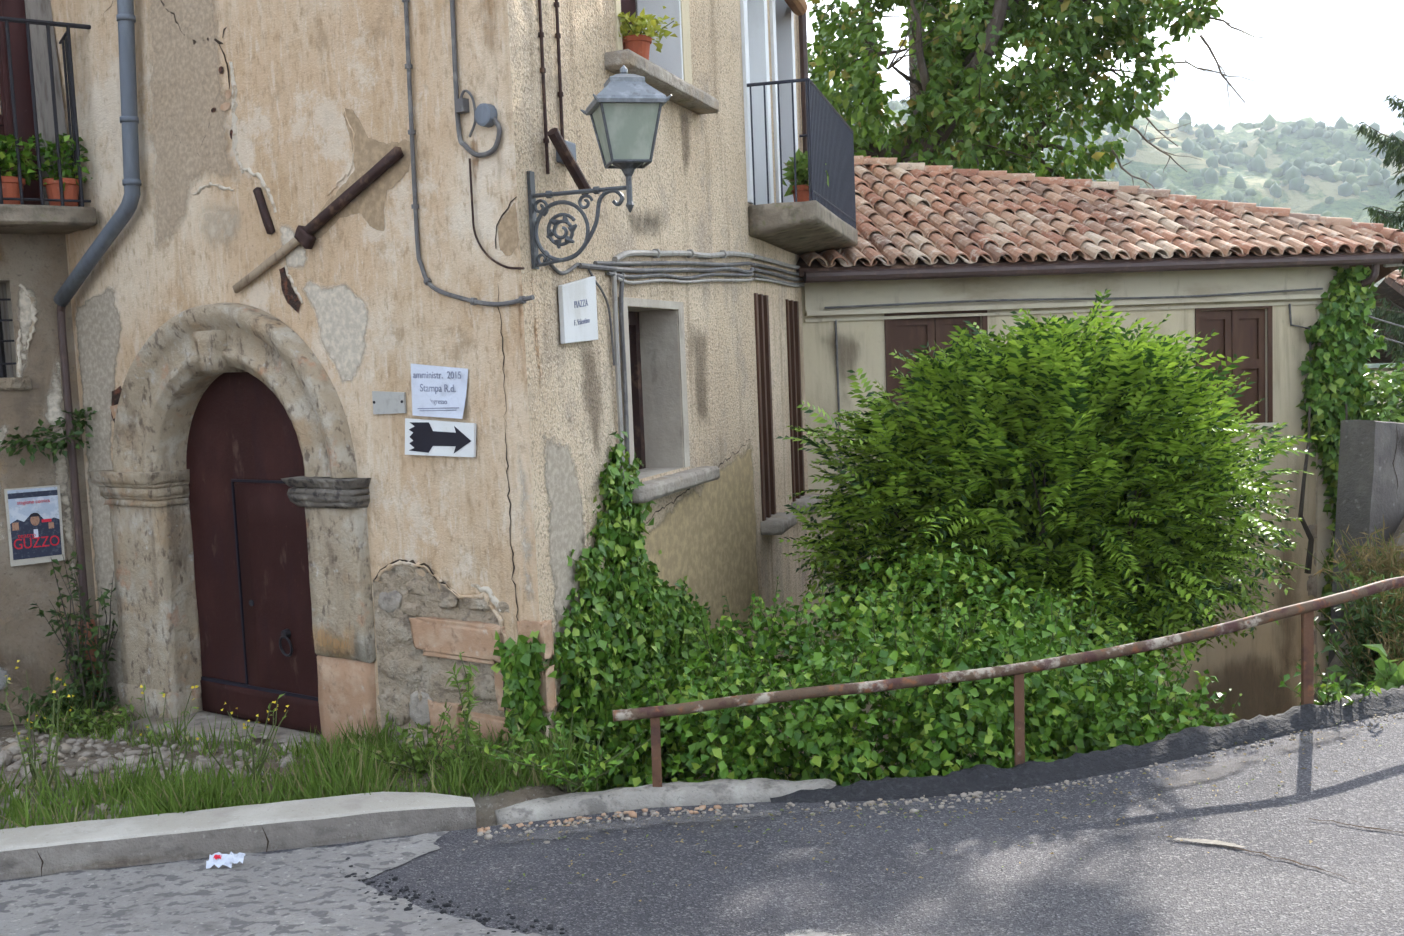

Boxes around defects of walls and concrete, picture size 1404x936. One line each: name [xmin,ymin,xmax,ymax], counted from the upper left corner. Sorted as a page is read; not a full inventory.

crack [160,0,230,89]
flaking render [150,0,411,381]
spalling [373,437,585,758]